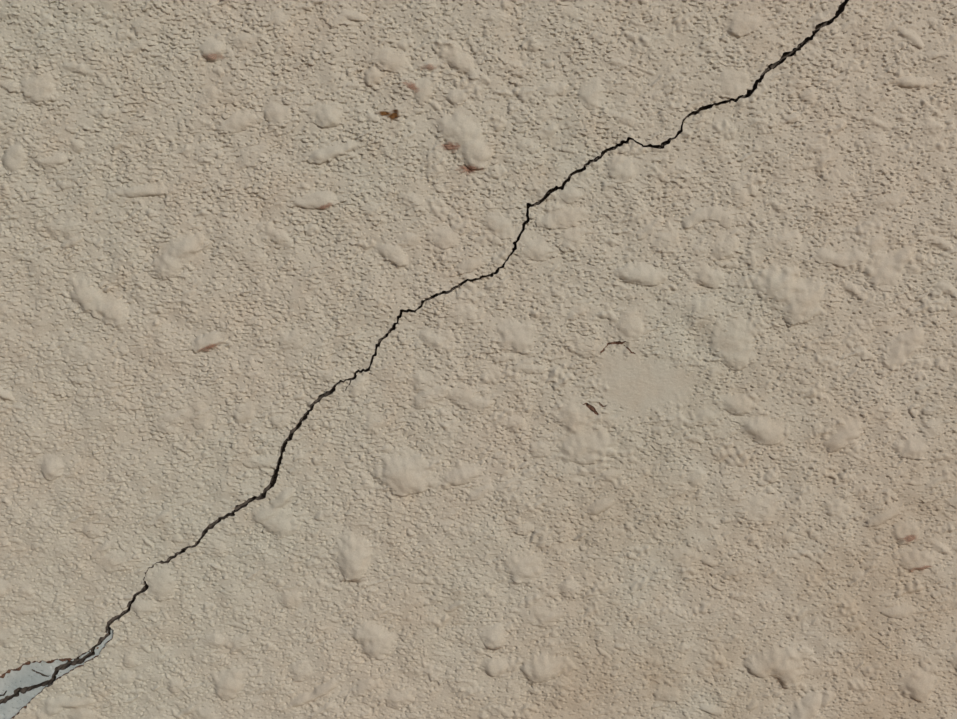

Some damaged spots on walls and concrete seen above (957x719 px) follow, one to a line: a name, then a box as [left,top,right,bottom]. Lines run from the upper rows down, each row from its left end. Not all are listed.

crack [352,0,849,380]
peeling [0,627,114,719]
crack [0,378,353,704]